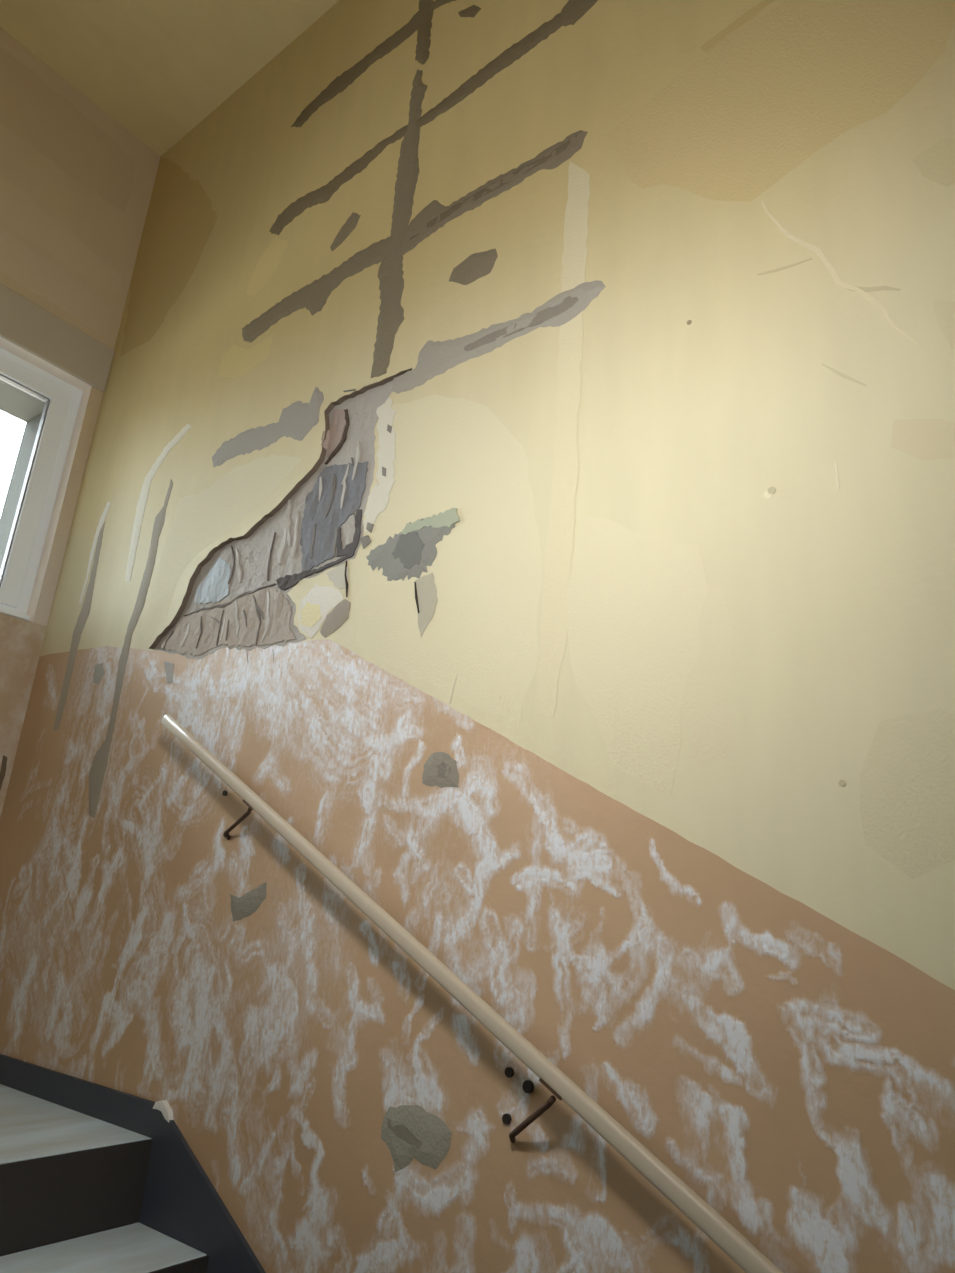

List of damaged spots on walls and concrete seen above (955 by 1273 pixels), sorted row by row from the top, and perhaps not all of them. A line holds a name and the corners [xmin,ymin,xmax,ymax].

flaking render [149,368,412,659]
water stain [859,709,955,879]